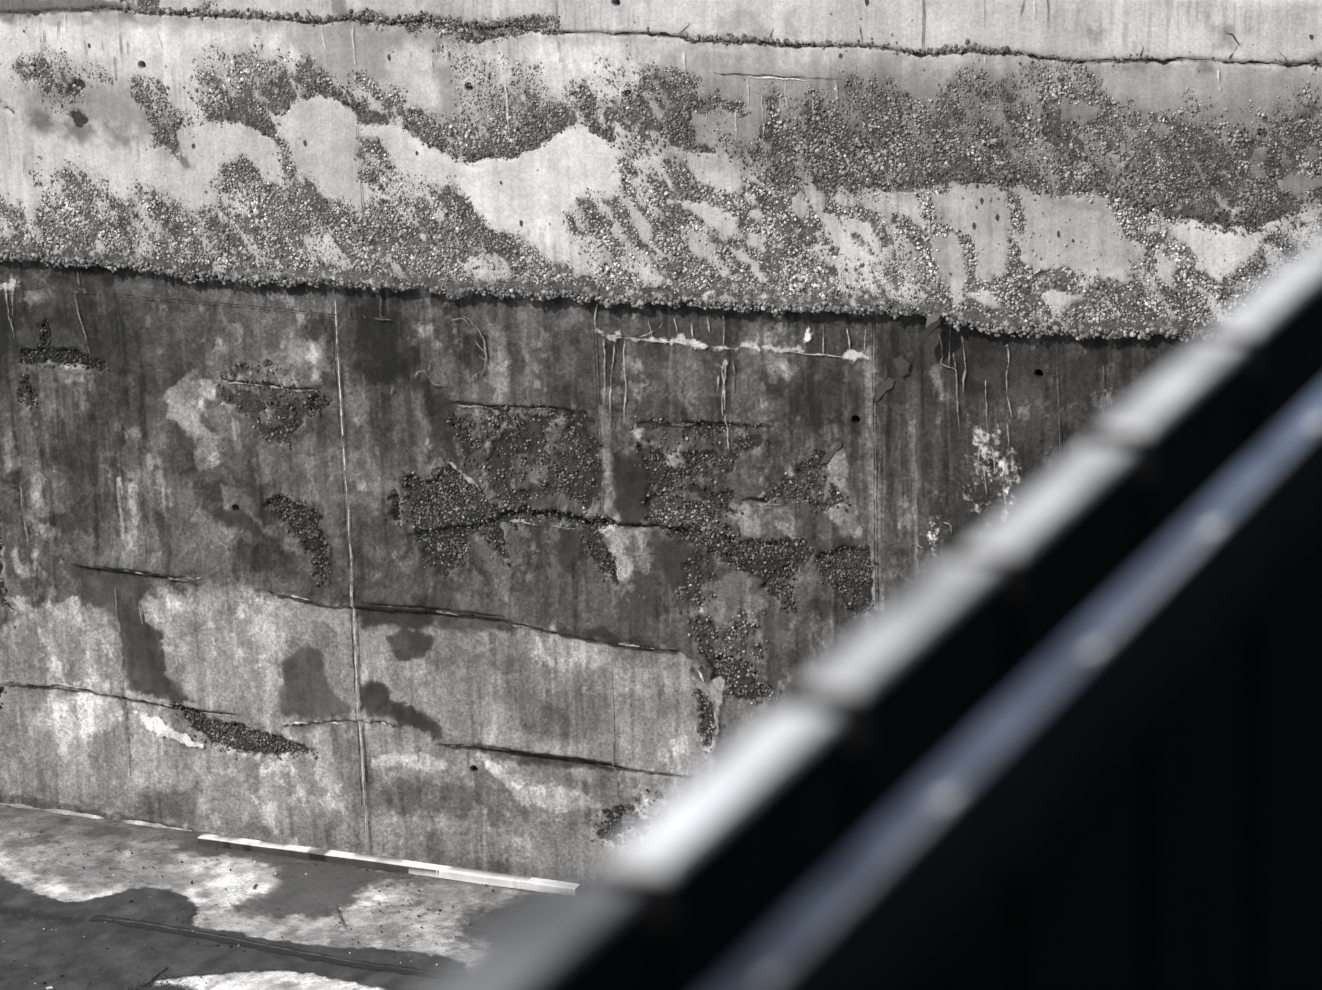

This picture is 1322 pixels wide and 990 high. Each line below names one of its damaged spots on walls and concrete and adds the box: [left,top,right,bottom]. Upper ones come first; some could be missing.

crack [8,3,1315,138]
spalling [0,7,1322,342]
spalling [15,320,109,413]
spalling [215,360,332,450]
spalling [384,404,621,585]
spalling [628,415,878,753]
crack [4,680,242,717]
spalling [172,703,318,761]
water stain [277,646,440,737]
water stain [0,876,456,990]
water stain [175,837,438,919]
water stain [456,891,536,940]